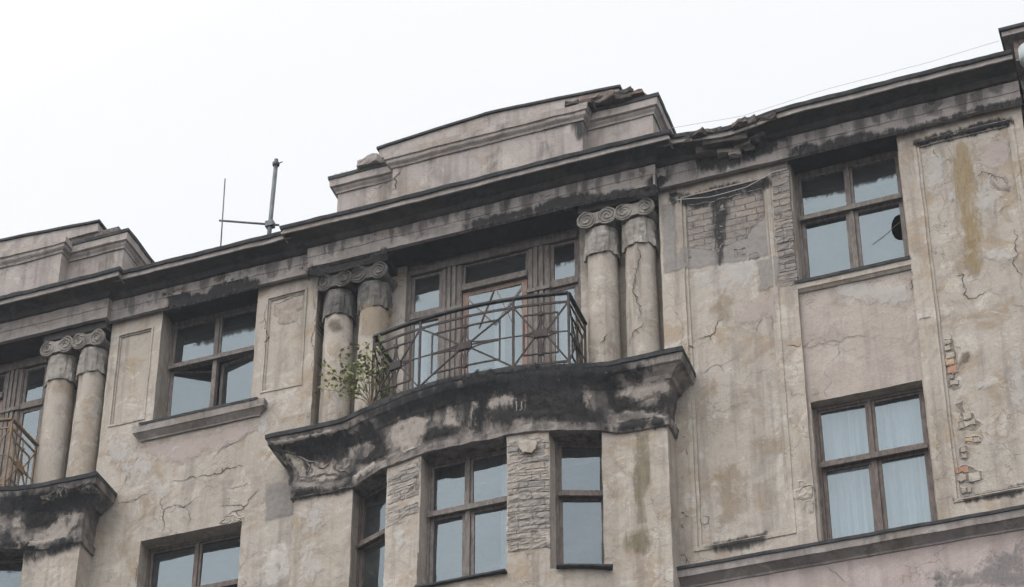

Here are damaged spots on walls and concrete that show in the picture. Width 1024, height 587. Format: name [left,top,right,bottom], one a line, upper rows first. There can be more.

spalling [564,86,647,112]
spalling [675,112,778,160]
crack [600,245,644,347]
flaking render [687,165,798,288]
crack [994,211,1024,307]
damp [423,385,482,432]
flaking render [943,338,985,496]
crack [117,432,259,531]